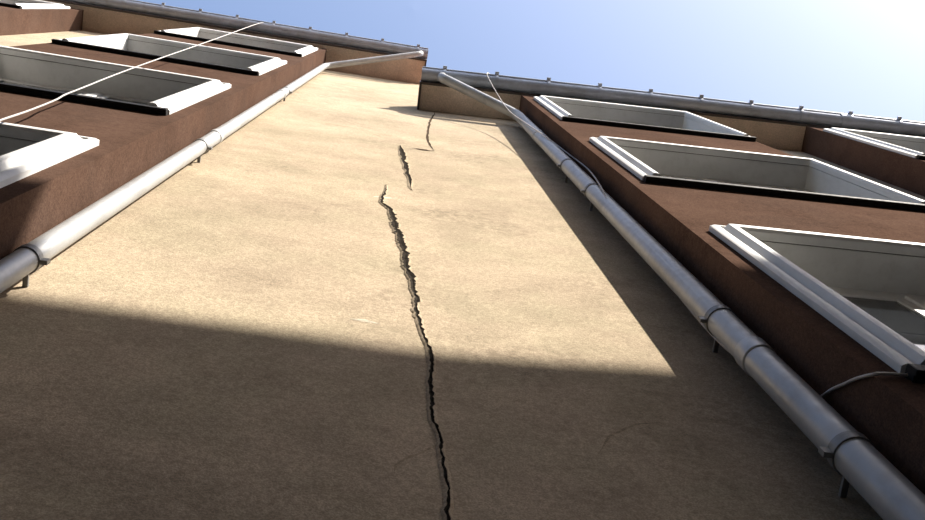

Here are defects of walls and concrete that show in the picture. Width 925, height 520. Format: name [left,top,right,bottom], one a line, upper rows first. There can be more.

crack [378,111,454,520]